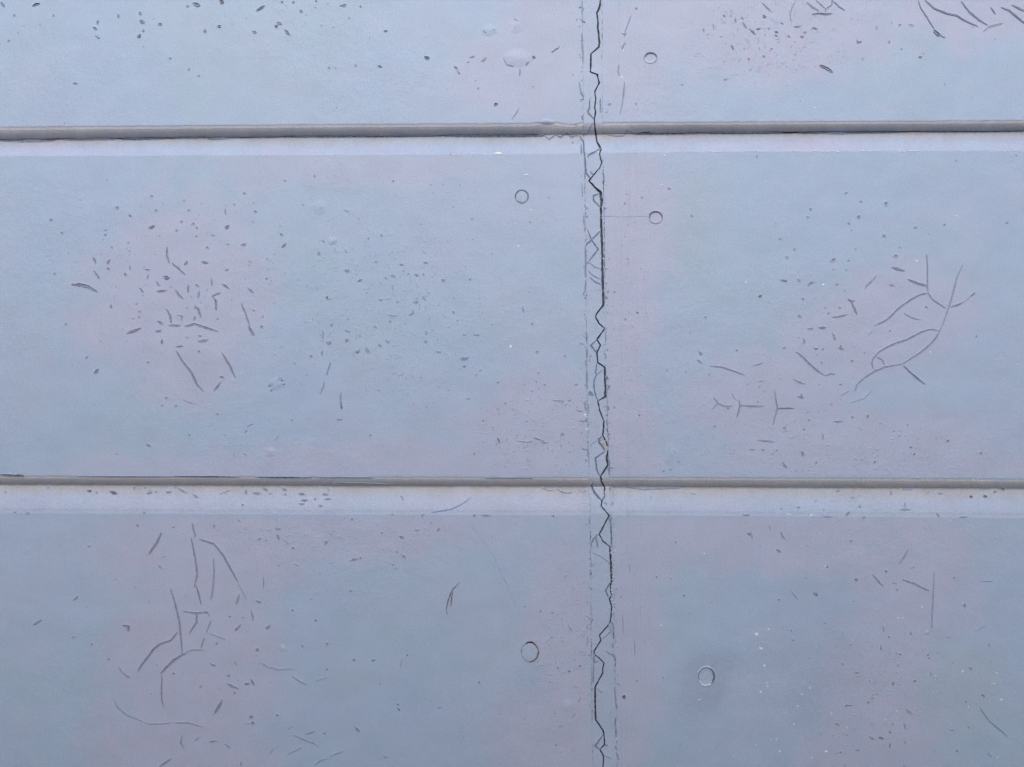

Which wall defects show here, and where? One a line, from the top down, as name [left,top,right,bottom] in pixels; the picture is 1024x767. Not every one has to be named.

crack [918,0,1024,38]
crack [797,129,901,137]
crack [922,127,1024,135]
crack [796,254,976,403]
crack [0,0,785,767]
crack [710,365,804,425]